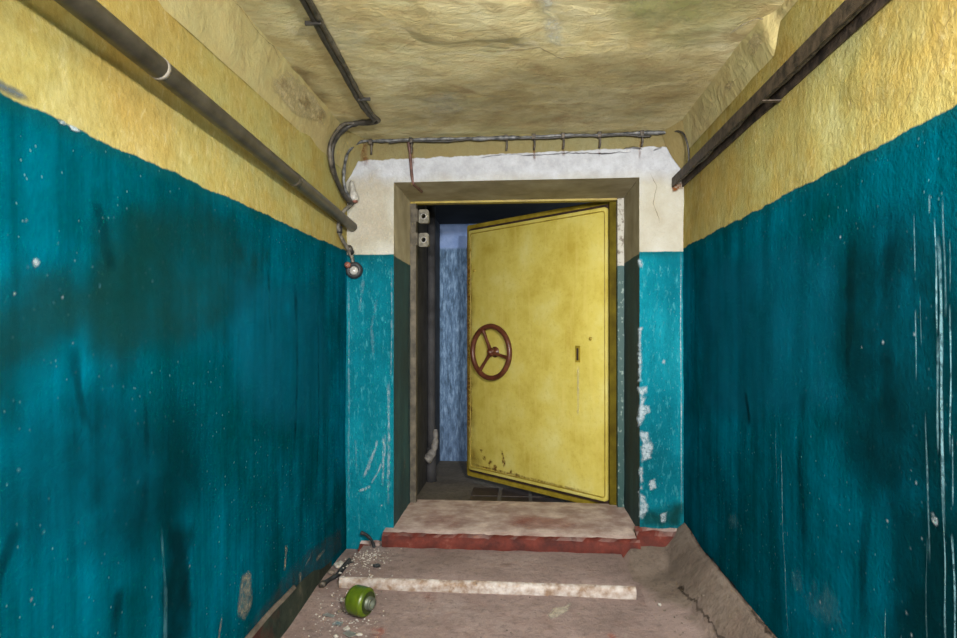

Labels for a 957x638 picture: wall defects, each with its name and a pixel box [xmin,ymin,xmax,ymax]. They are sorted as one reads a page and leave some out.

peeling [638,388,656,517]
peeling [239,575,251,614]
crack [688,527,777,638]